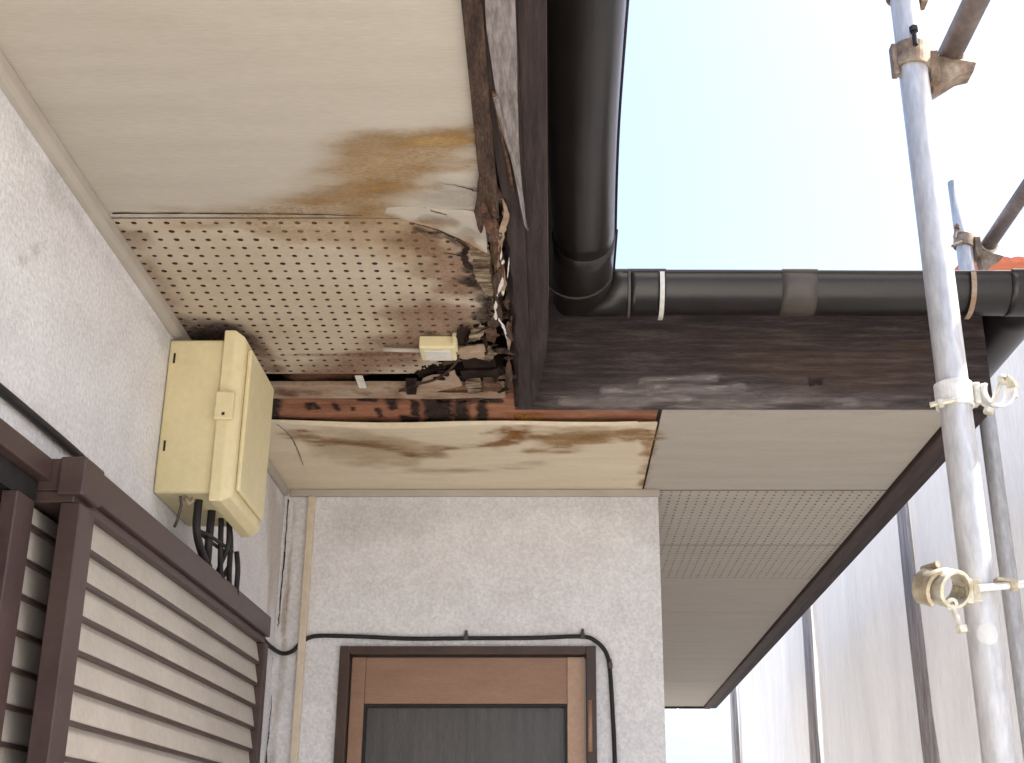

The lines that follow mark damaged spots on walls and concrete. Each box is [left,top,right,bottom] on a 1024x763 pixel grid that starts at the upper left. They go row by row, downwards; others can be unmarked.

peeling [485,0,529,231]
leakage [231,132,475,220]
leakage [300,305,464,378]
peeling [433,359,462,381]
peeling [461,250,516,393]
leakage [272,386,504,456]
leakage [479,415,534,447]